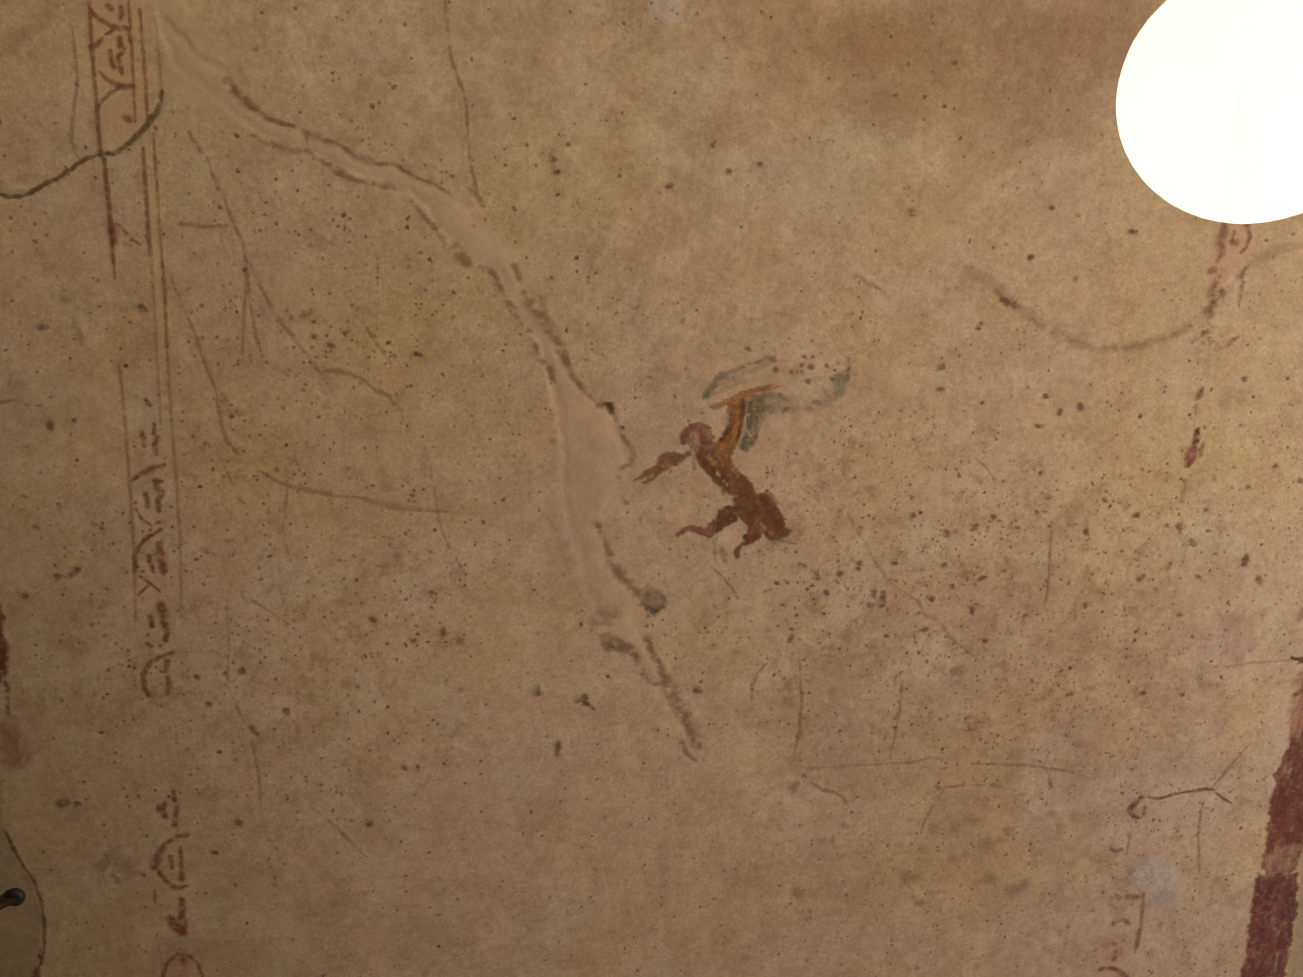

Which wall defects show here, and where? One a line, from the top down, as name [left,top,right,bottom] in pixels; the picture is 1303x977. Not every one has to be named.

crack [0,23,701,761]